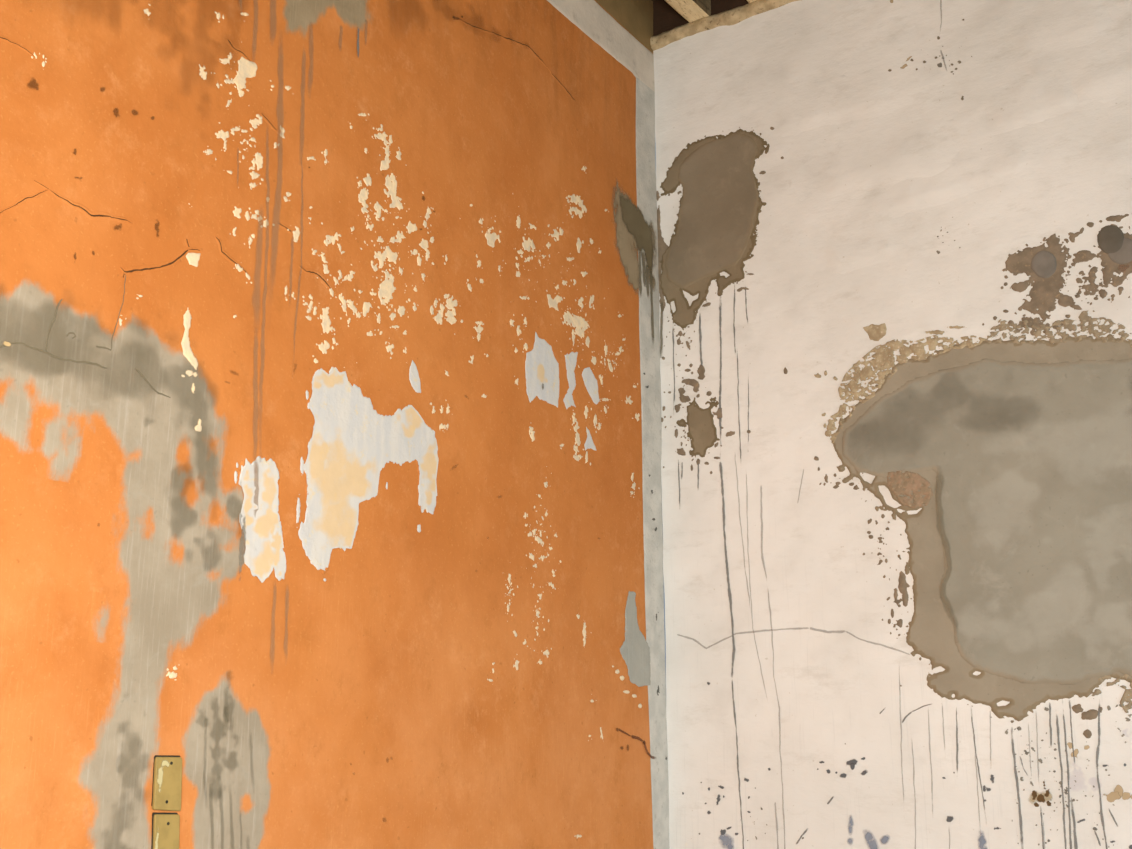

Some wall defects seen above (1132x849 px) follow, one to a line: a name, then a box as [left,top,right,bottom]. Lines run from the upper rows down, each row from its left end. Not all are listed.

peeling [199,52,264,190]
crack [261,112,277,131]
crack [455,16,576,102]
crack [0,180,132,224]
crack [0,236,249,368]
crack [136,369,170,398]
crack [299,265,331,289]
peeling [230,106,489,583]
peeling [498,190,649,466]
spalling [814,214,1132,444]
peeling [863,514,910,639]
flaking render [1072,674,1132,738]